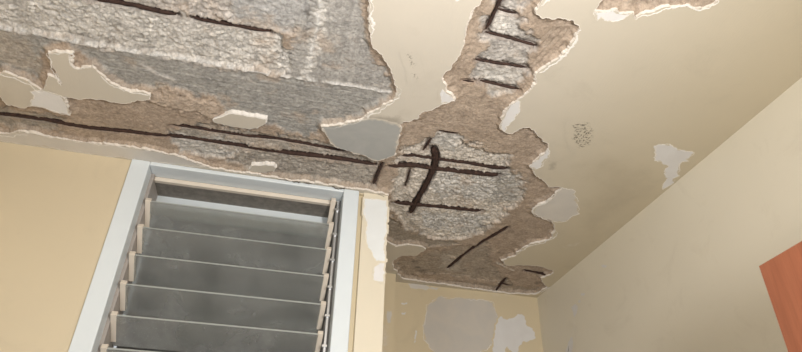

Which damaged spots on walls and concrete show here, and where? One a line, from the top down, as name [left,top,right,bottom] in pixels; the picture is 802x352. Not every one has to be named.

spalling [590,0,719,24]
spalling [0,0,581,352]
peeling [651,143,697,191]